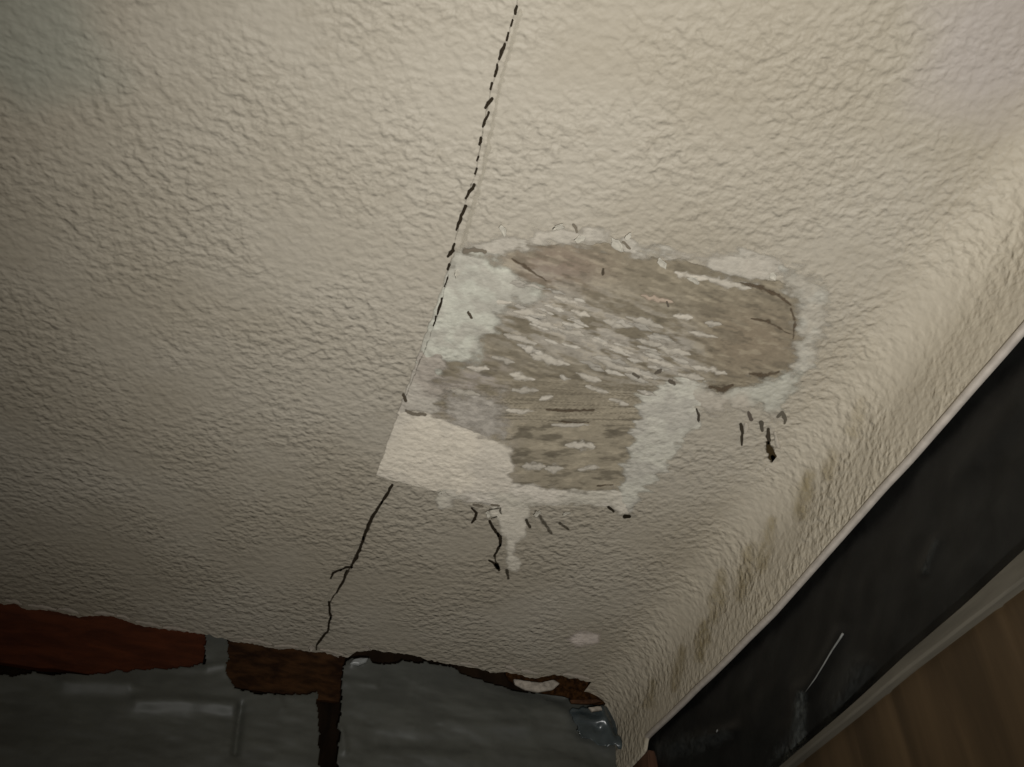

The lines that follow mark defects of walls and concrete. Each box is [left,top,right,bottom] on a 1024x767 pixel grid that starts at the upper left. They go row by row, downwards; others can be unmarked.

crack [433,6,521,326]
flaking render [376,224,831,572]
crack [316,484,394,651]
crack [471,508,510,579]
crack [525,511,569,535]
flaking render [94,611,190,632]
flaking render [243,638,344,658]